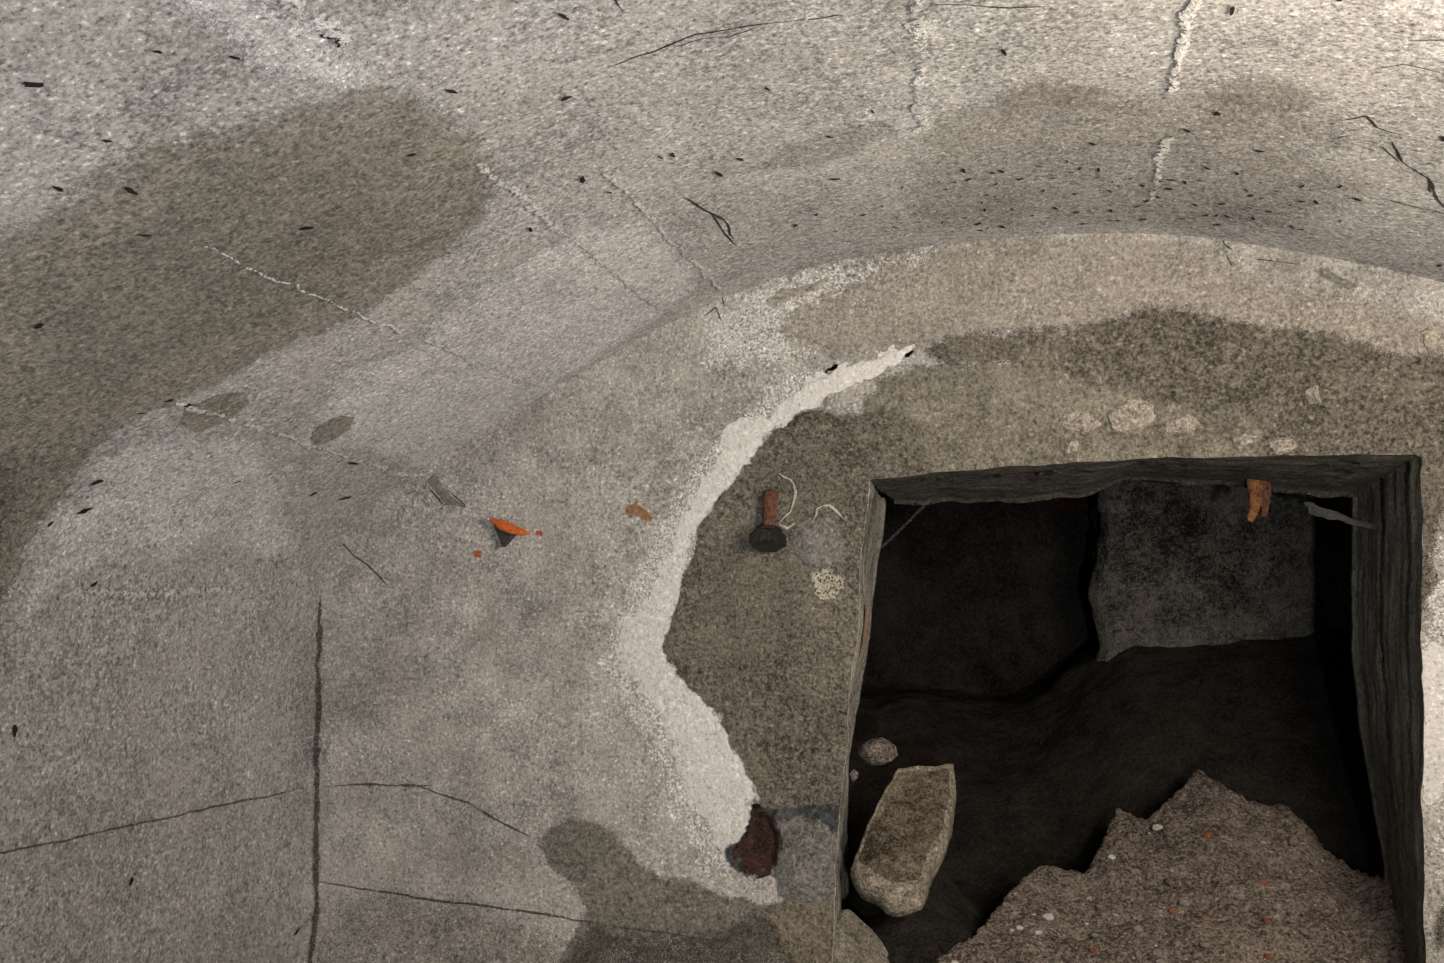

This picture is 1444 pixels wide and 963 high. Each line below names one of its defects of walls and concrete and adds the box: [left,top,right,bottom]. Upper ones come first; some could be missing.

damp [0,0,719,646]
damp [301,60,1444,963]
rust [725,802,840,879]